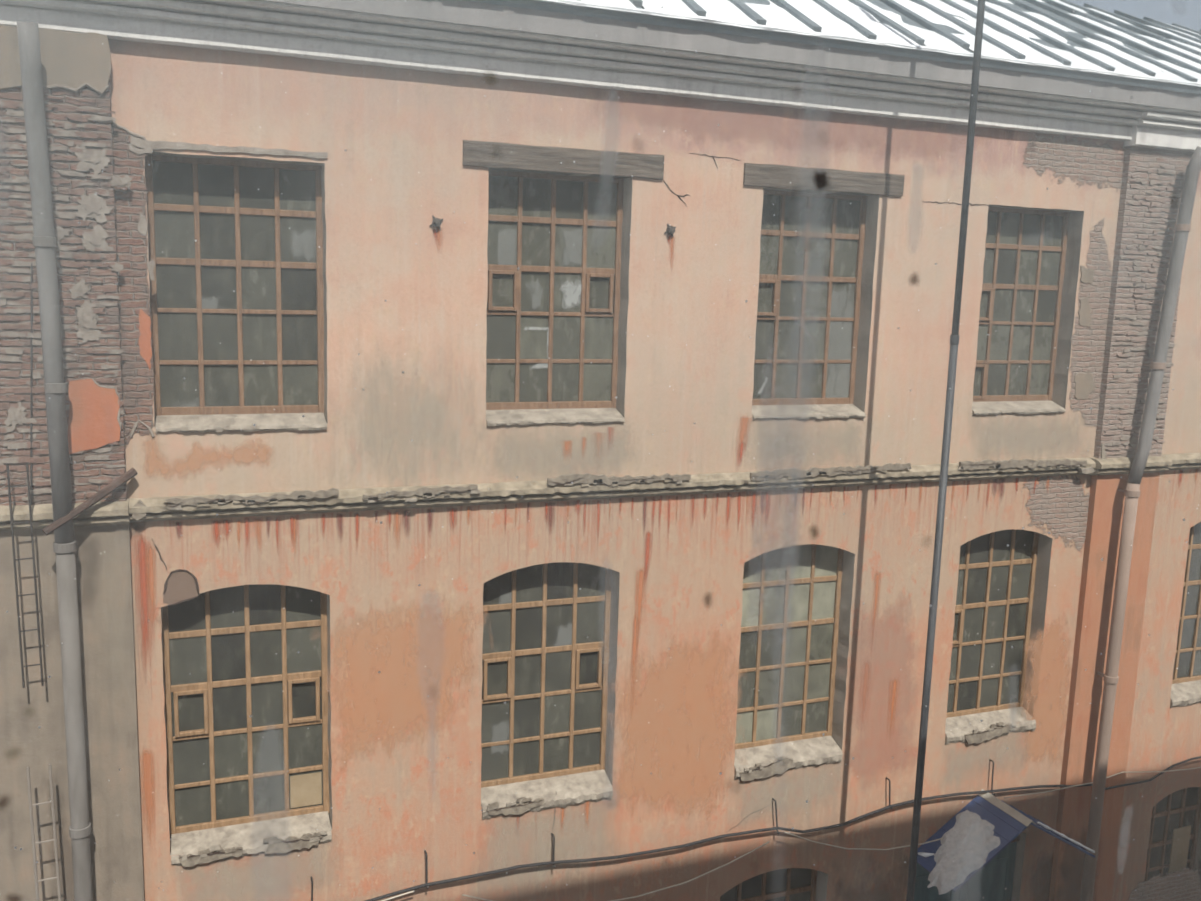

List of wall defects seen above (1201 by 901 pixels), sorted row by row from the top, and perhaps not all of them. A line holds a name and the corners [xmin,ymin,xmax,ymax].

flaking render [1023,133,1125,191]
crack [663,180,689,207]
rust [214,517,295,546]
rust [322,514,359,540]